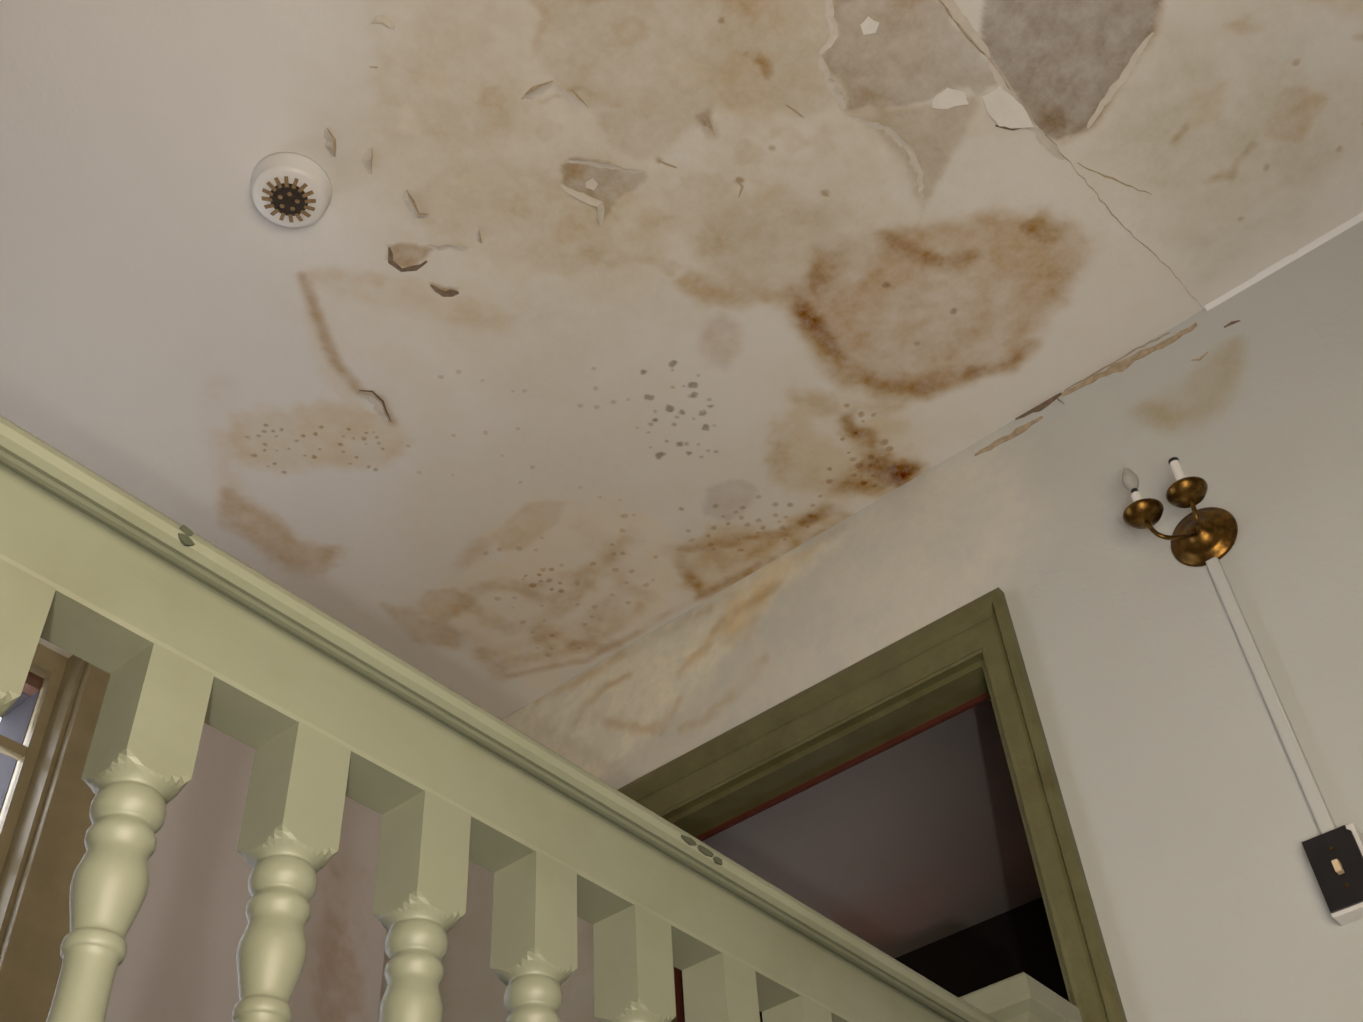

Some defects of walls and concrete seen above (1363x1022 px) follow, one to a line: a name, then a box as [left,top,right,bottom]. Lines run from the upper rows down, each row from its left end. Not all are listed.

peeling [324,128,336,157]
peeling [359,0,1154,298]
leakage [190,0,1363,790]